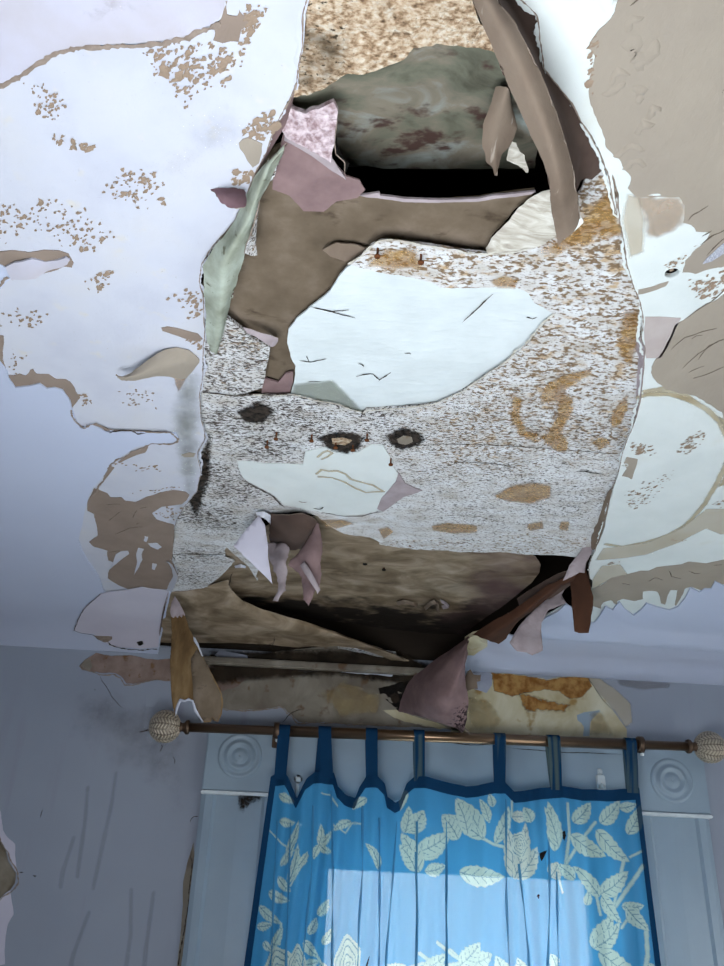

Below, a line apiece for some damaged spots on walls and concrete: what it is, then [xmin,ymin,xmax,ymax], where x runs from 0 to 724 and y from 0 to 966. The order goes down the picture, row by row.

peeling [0,0,309,651]
peeling [516,0,724,622]
rust [513,371,590,452]
rust [611,399,627,428]
peeling [332,437,352,445]
peeling [397,436,413,445]
water stain [386,429,425,450]
rust [496,484,550,503]
flaking render [465,631,487,656]
water stain [210,649,429,684]
flaking render [221,672,627,738]
flaking render [0,812,19,965]